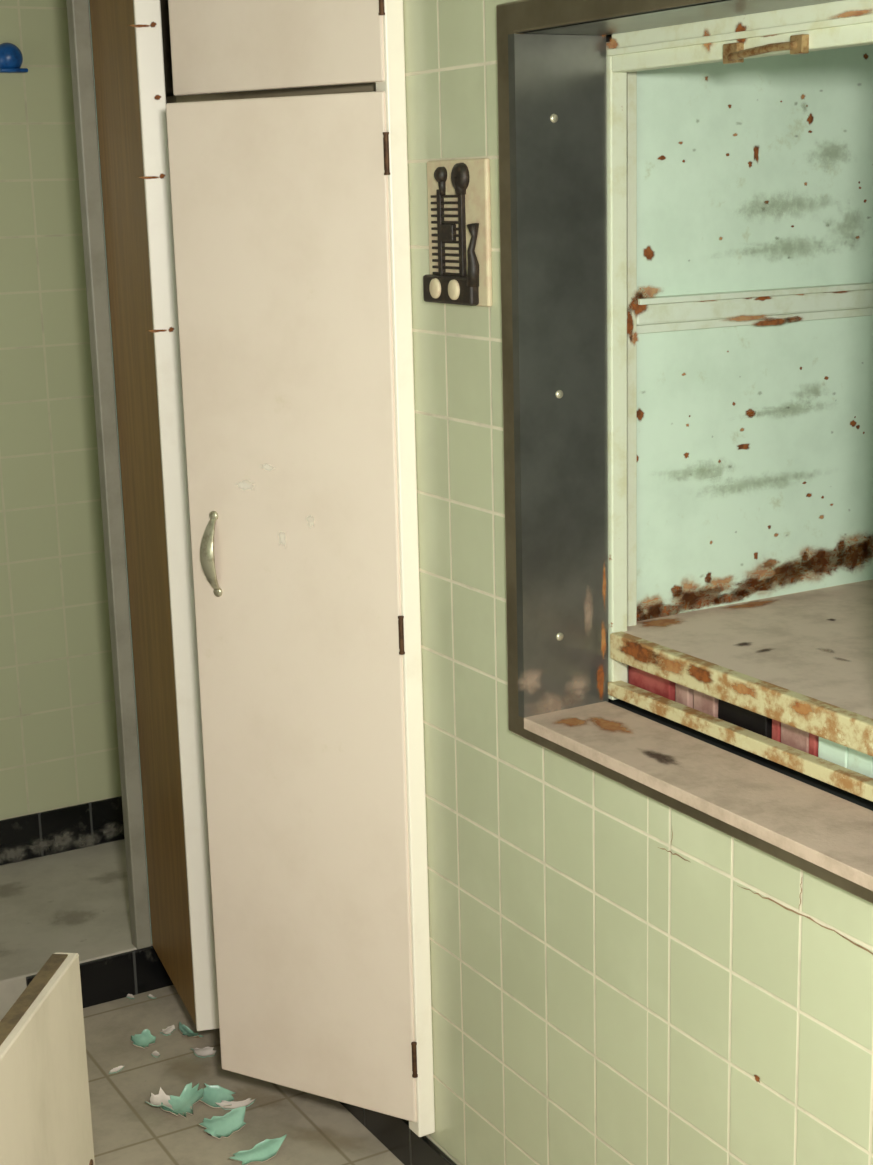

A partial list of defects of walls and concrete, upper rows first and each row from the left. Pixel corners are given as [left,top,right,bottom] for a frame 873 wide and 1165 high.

corrosion [835,10,871,18]
corrosion [627,287,659,344]
corrosion [729,315,802,326]
corrosion [637,535,873,621]
corrosion [597,628,606,699]
corrosion [620,641,712,683]
corrosion [732,683,755,698]
corrosion [791,702,813,715]
corrosion [557,718,630,732]
corrosion [645,751,674,763]
crack [737,878,873,955]